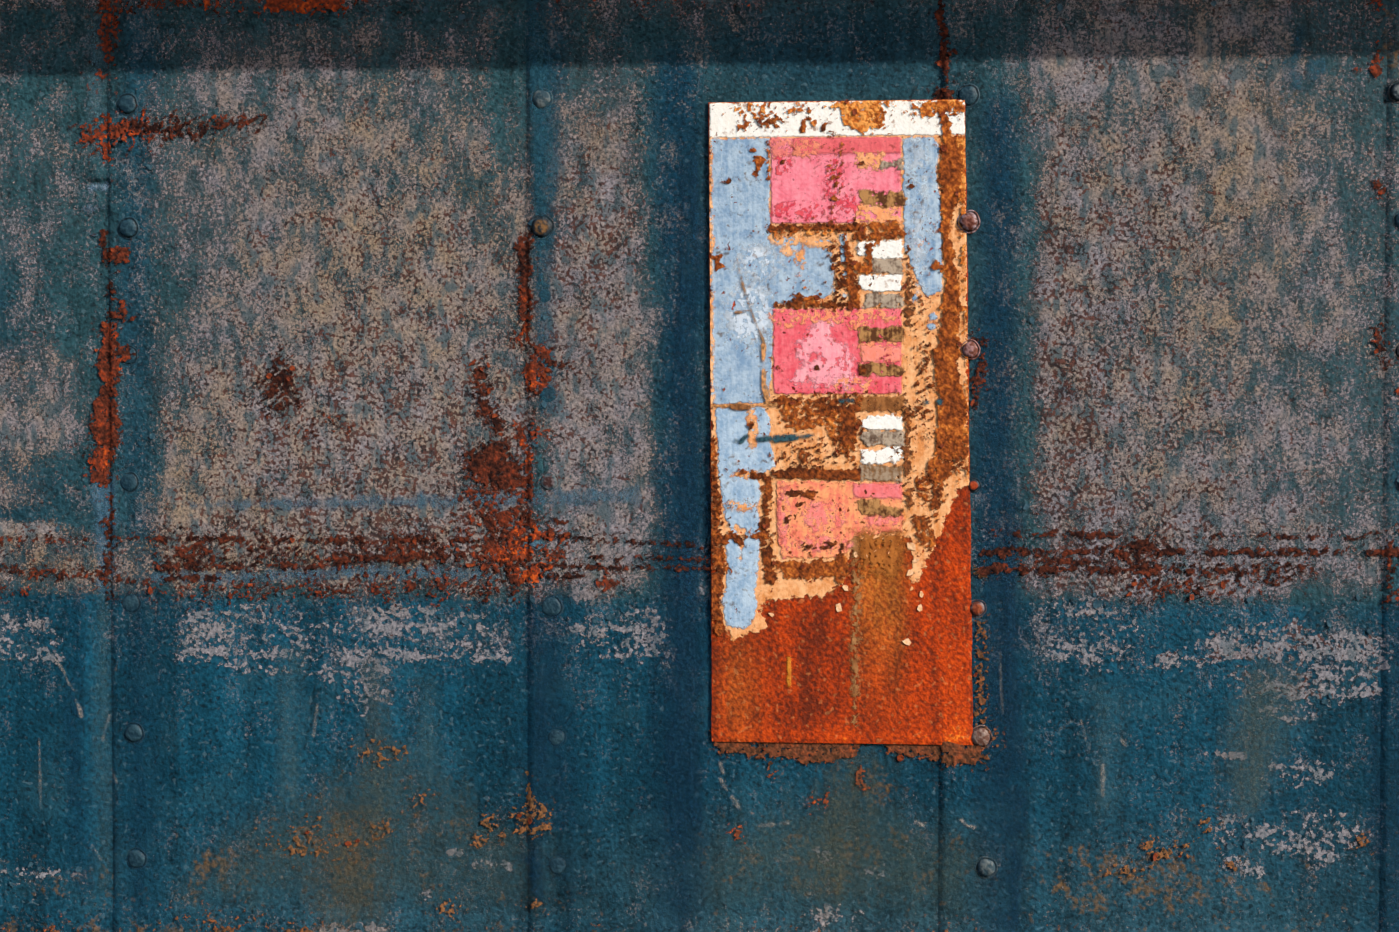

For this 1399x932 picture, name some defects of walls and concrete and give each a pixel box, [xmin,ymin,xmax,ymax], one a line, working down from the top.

rust [93,0,387,84]
rust [75,107,269,167]
peeling [0,0,813,717]
rust [0,229,867,637]
rust [969,526,1399,606]
rust [885,616,999,768]
rust [714,742,871,791]